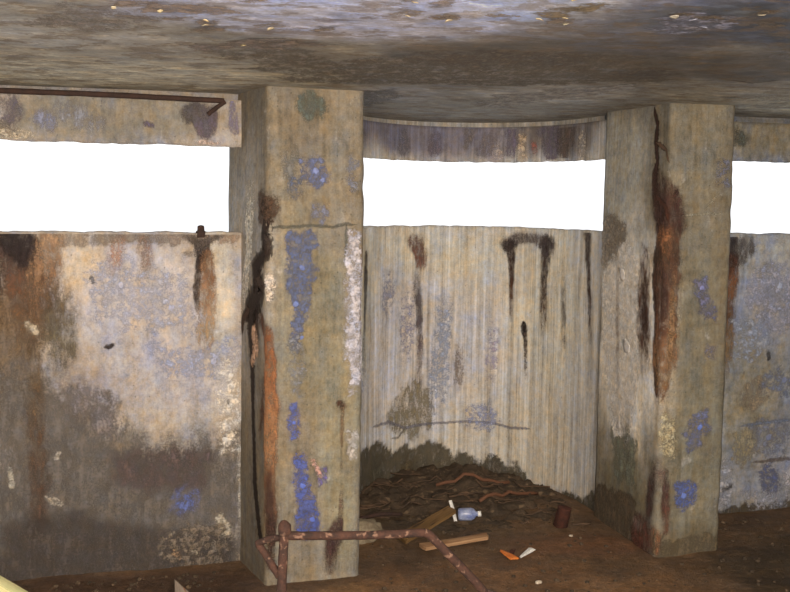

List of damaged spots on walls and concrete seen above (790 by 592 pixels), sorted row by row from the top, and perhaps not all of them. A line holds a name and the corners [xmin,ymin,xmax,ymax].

leakage [0,234,241,581]
rust [186,235,219,347]
rust [254,311,279,566]
rust [638,169,686,400]
rust [725,237,755,373]